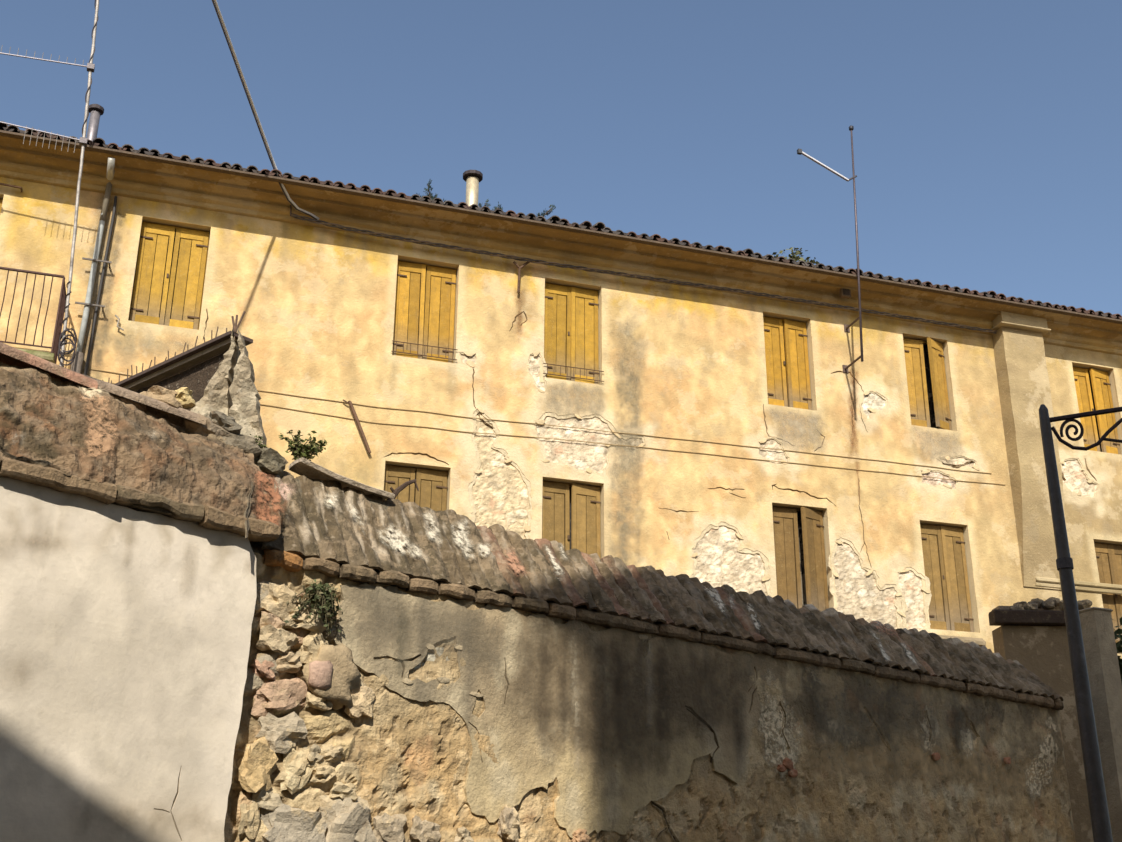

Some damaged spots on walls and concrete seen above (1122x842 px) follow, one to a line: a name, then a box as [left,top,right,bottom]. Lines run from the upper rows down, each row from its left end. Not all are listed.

peeling [380,526,421,556]
crack [472,369,495,429]
spalling [453,406,532,557]
spalling [534,412,645,477]
spalling [690,522,771,630]
crack [772,484,832,503]
crack [858,479,877,581]
spalling [827,538,932,663]
spalling [234,583,474,842]
crack [373,654,420,678]
water stain [518,628,732,758]
crack [650,801,680,842]